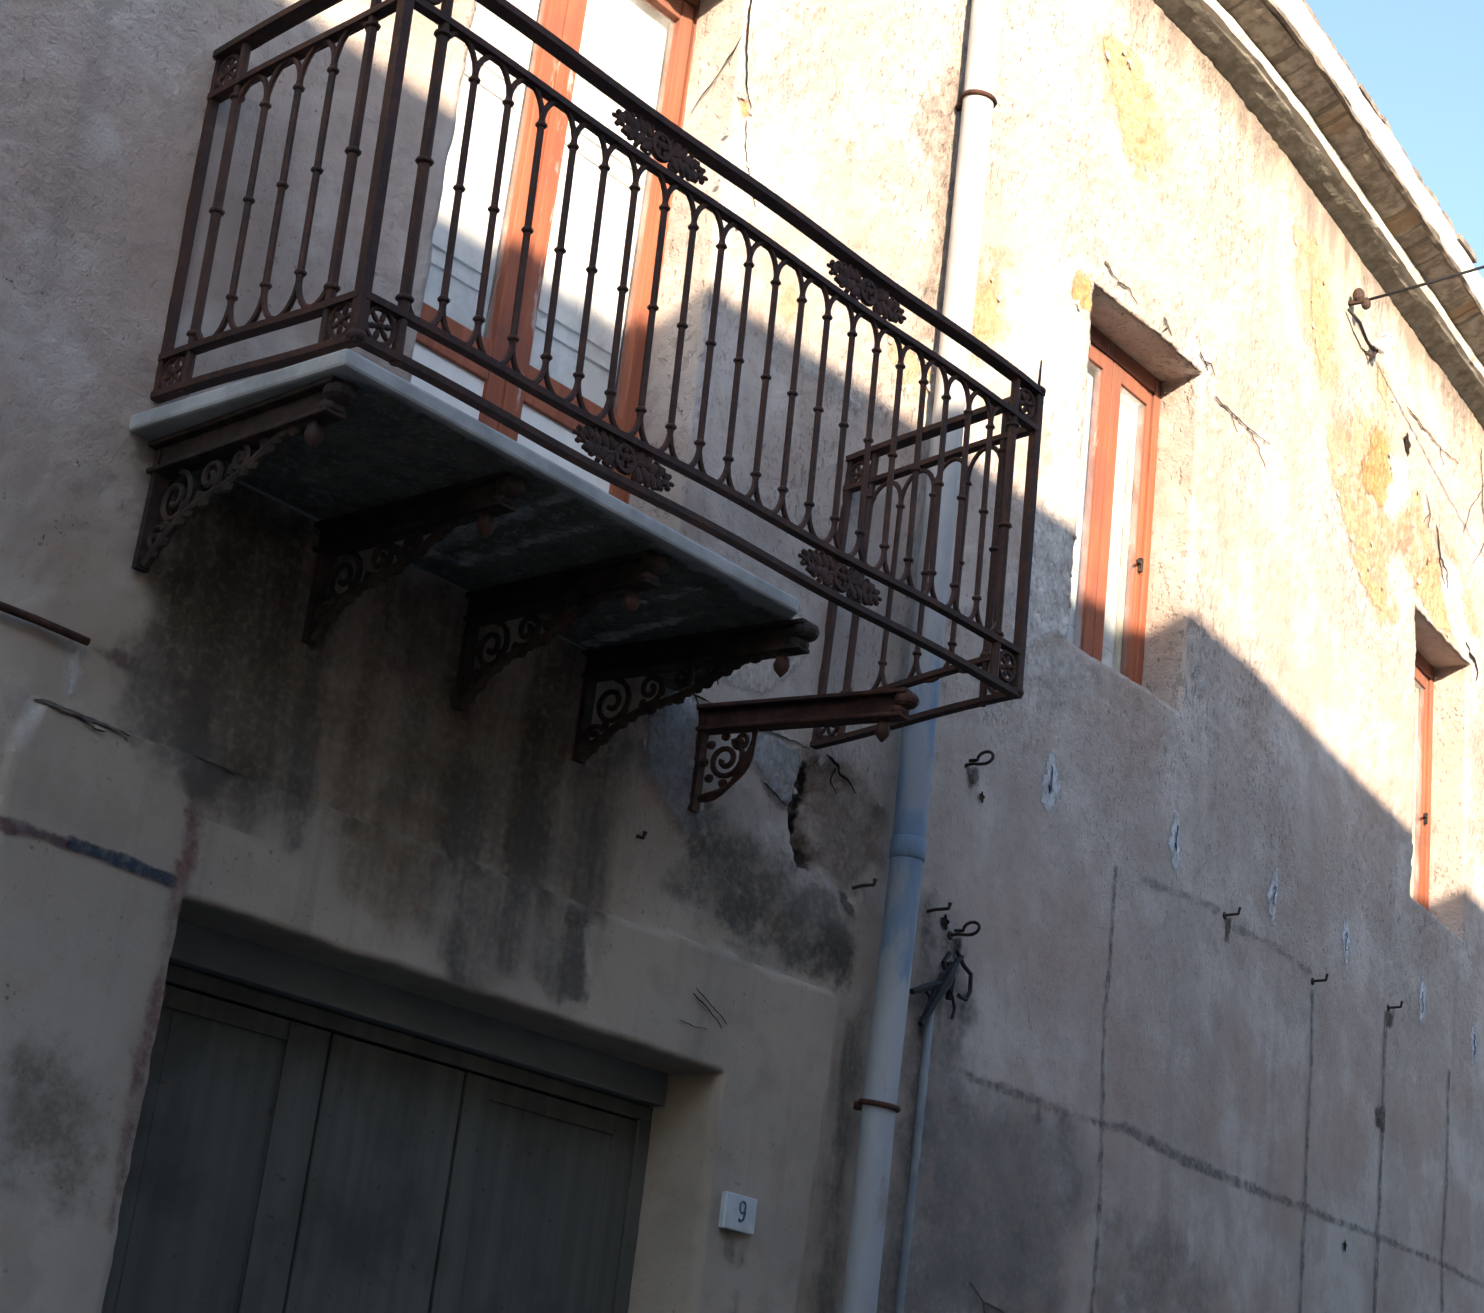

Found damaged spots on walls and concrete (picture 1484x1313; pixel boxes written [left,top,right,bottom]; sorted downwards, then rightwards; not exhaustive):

crack [691,0,756,207]
peeling [1104,36,1156,170]
peeling [1378,365,1395,414]
peeling [1327,428,1393,610]
peeling [1417,557,1461,638]
crack [1407,407,1484,588]
leakage [131,386,780,998]
spalling [787,755,883,905]